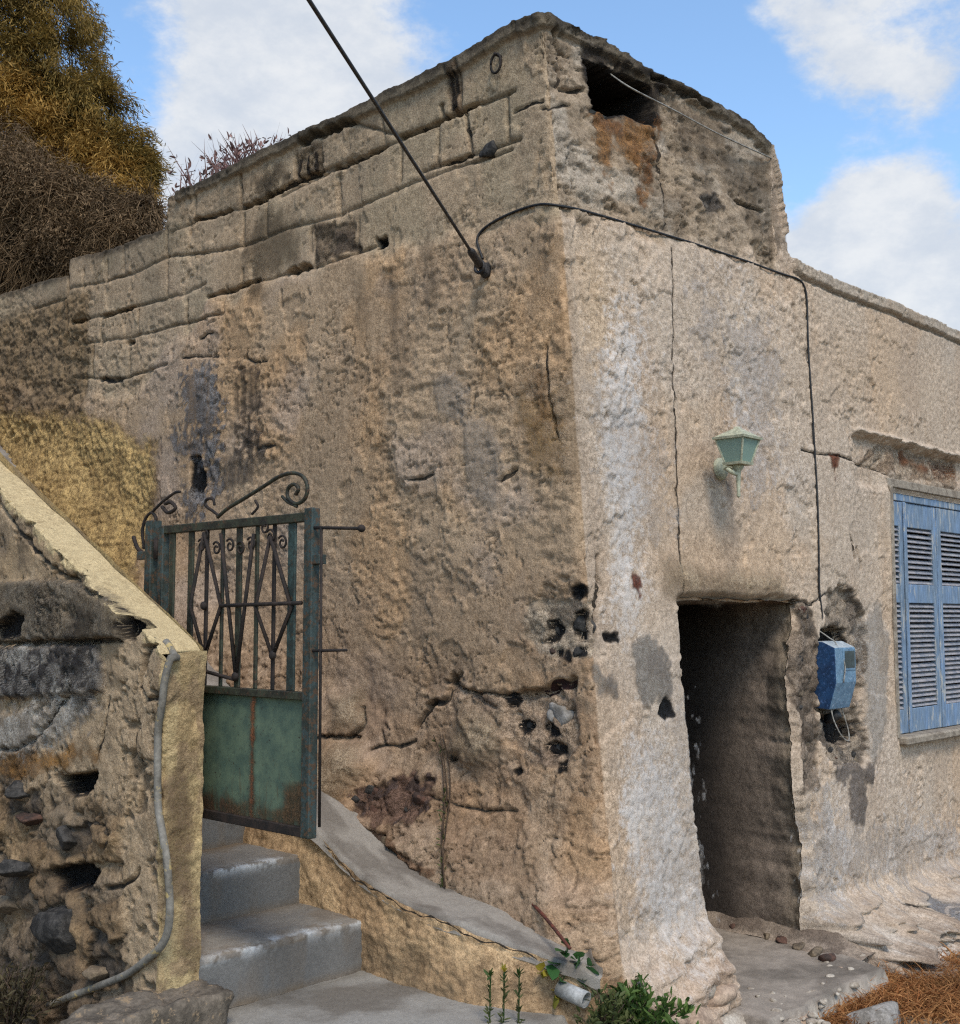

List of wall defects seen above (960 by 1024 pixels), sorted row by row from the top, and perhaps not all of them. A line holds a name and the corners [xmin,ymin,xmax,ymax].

corrosion [593,112,662,208]
crack [546,349,559,438]
crack [651,129,685,595]
spalling [860,445,957,489]
spalling [524,597,595,657]
spalling [344,770,436,878]
crack [325,846,537,960]